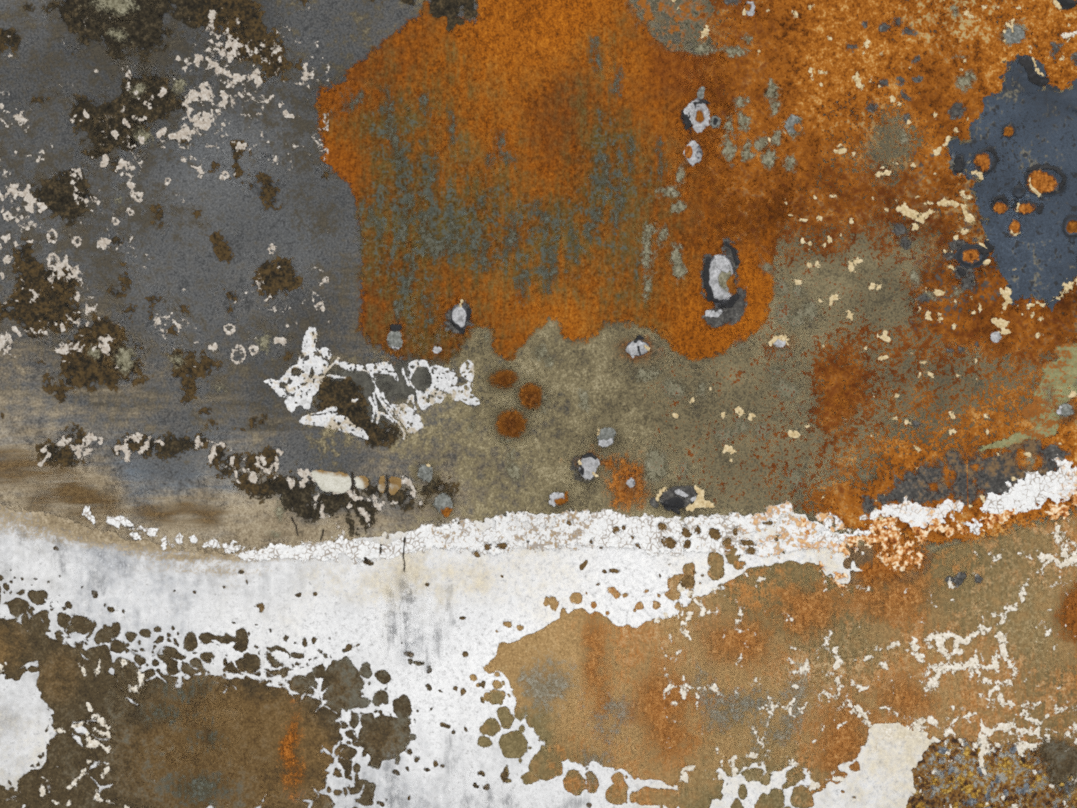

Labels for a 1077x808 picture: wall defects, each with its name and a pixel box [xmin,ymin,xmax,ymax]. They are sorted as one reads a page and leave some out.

peeling [92,10,301,225]
peeling [284,41,330,88]
spalling [852,55,923,125]
leakage [956,71,977,92]
peeling [884,24,1077,338]
peeling [0,159,113,362]
peeling [154,312,218,351]
peeling [223,324,259,364]
peeling [264,323,480,440]
leakage [765,346,804,410]
leakage [759,263,817,330]
peeling [0,343,1077,808]